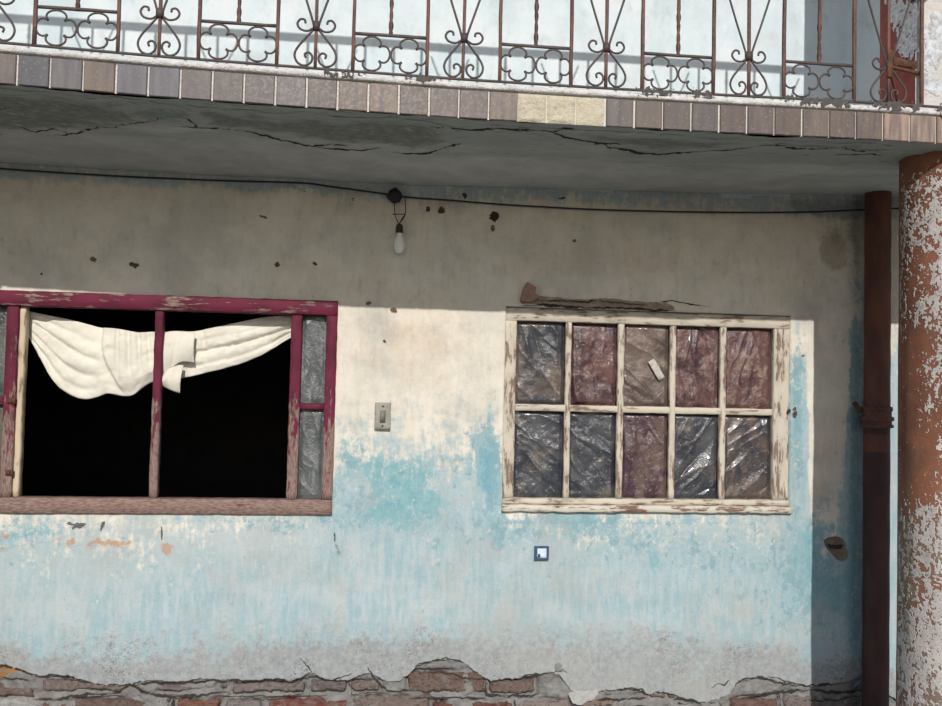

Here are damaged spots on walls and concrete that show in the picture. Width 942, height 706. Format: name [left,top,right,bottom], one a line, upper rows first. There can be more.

peeling [884,0,919,60]
crack [0,107,892,155]
peeling [791,335,808,500]
peeling [889,160,942,706]
peeling [336,433,453,538]
peeling [468,439,503,517]
peeling [757,515,785,542]
peeling [794,512,863,628]
spalling [0,658,862,706]